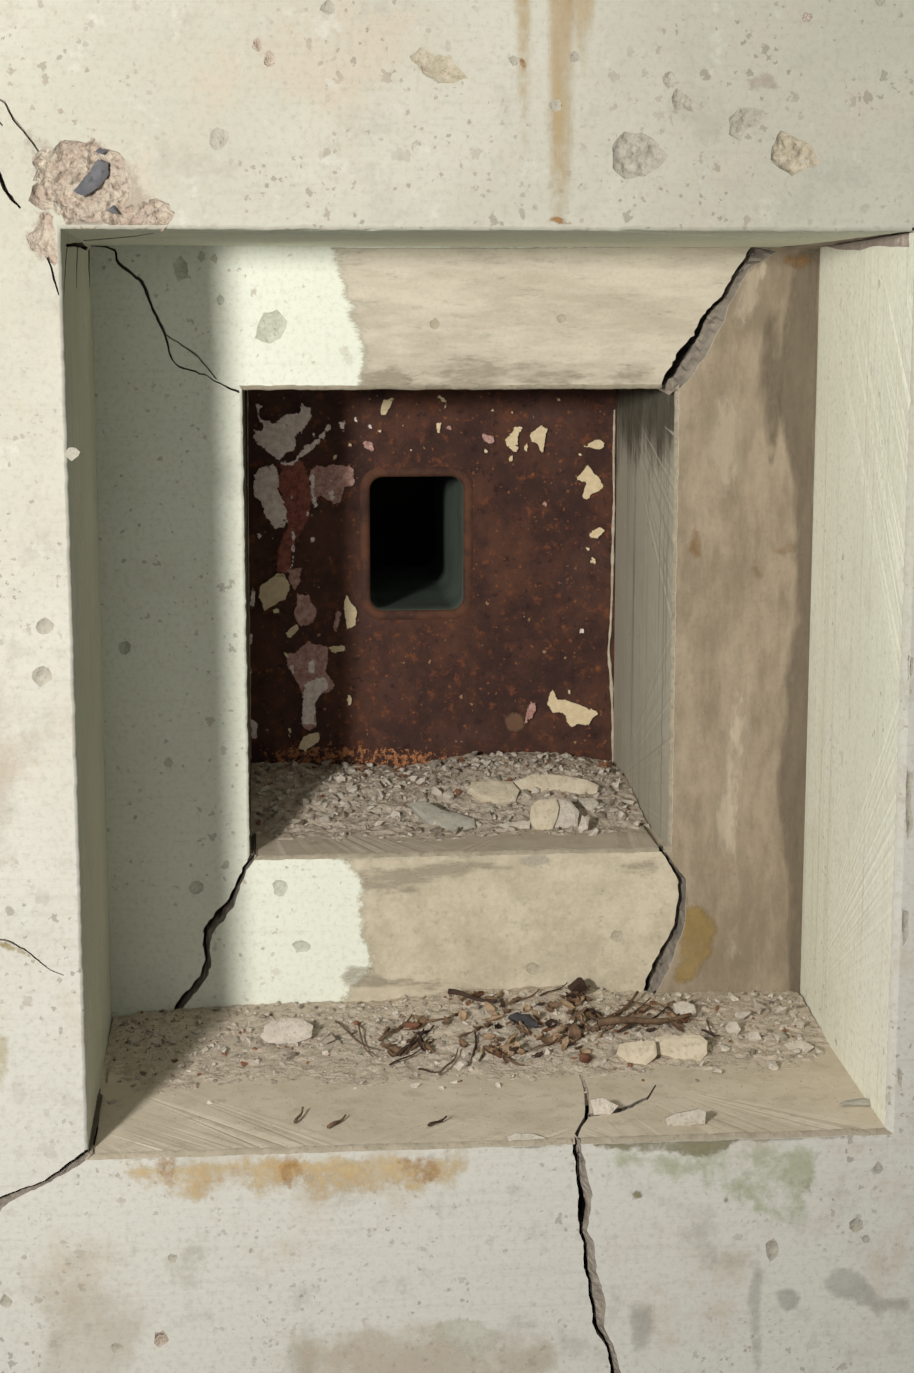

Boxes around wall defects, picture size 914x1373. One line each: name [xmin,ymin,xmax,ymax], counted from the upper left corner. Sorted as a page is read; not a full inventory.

crack [0,172,21,209]
crack [0,99,39,152]
spalling [26,138,175,266]
crack [47,233,239,393]
crack [658,227,914,395]
peeling [247,398,394,752]
rust [260,741,461,766]
crack [0,939,64,976]
crack [175,833,257,1009]
crack [643,829,686,993]
crack [0,1078,106,1211]
crack [557,1075,655,1373]